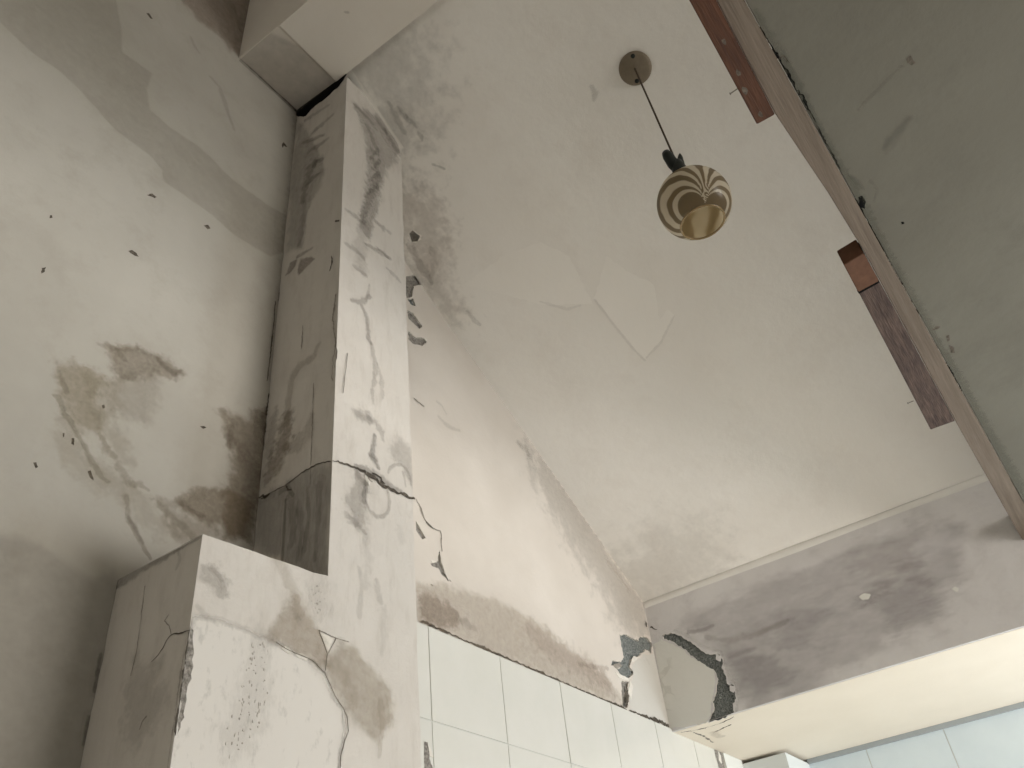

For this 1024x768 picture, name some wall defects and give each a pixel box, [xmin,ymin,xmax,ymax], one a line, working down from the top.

spalling [406,276,427,346]
crack [259,256,442,548]
crack [130,585,190,676]
crack [276,630,349,768]
spalling [611,635,651,707]
spalling [664,633,736,722]